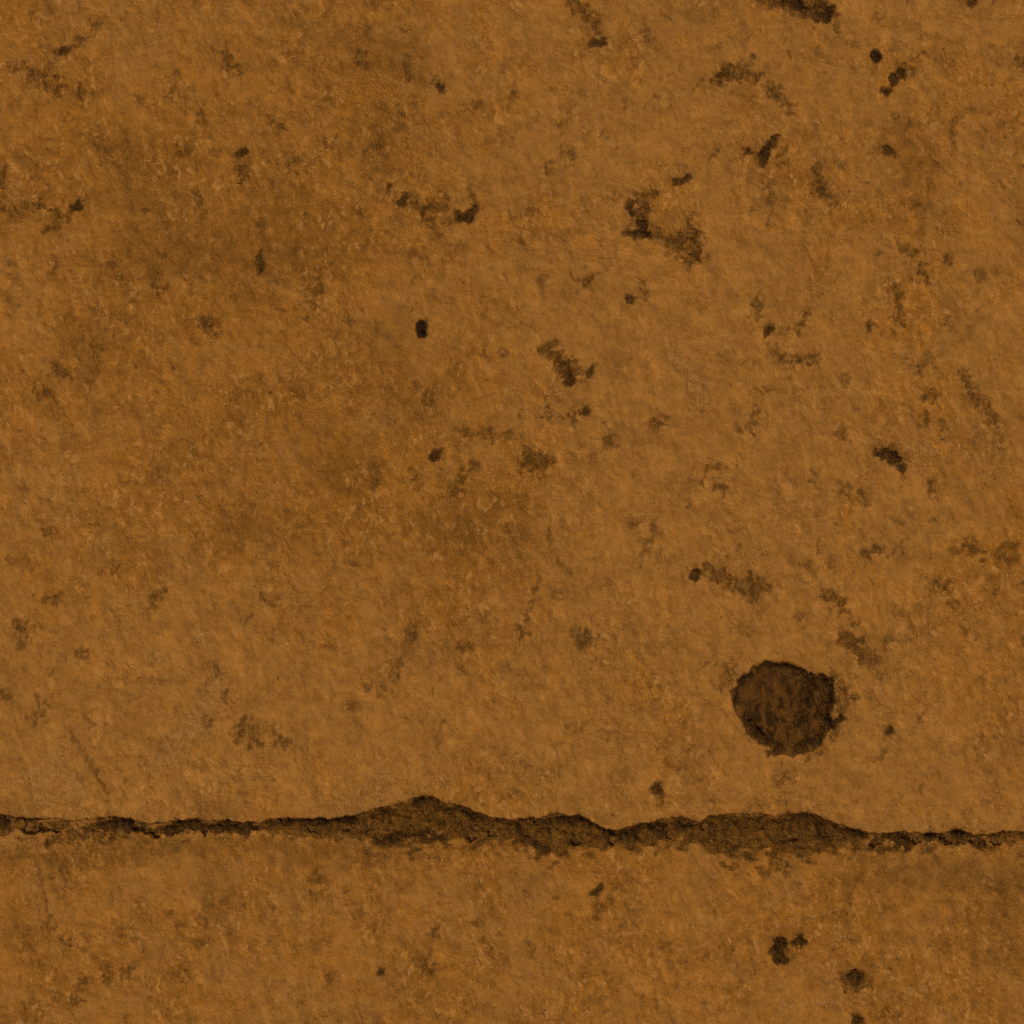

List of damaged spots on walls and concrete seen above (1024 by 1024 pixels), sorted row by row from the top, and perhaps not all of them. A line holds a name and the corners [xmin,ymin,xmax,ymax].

peeling [767,743,785,756]
crack [0,796,1024,869]